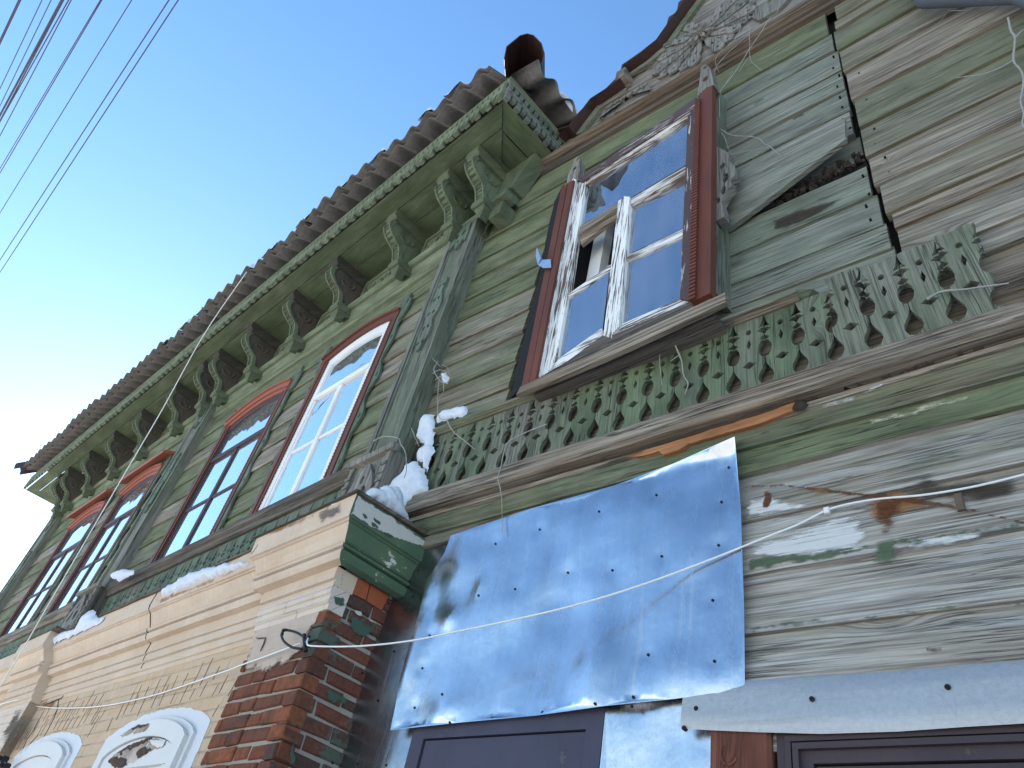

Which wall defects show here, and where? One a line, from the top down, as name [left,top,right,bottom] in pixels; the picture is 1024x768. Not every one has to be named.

peeling [351,496,425,546]
corrosion [752,484,976,533]
peeling [750,547,859,569]
crack [17,593,236,754]
flaking render [108,723,165,768]